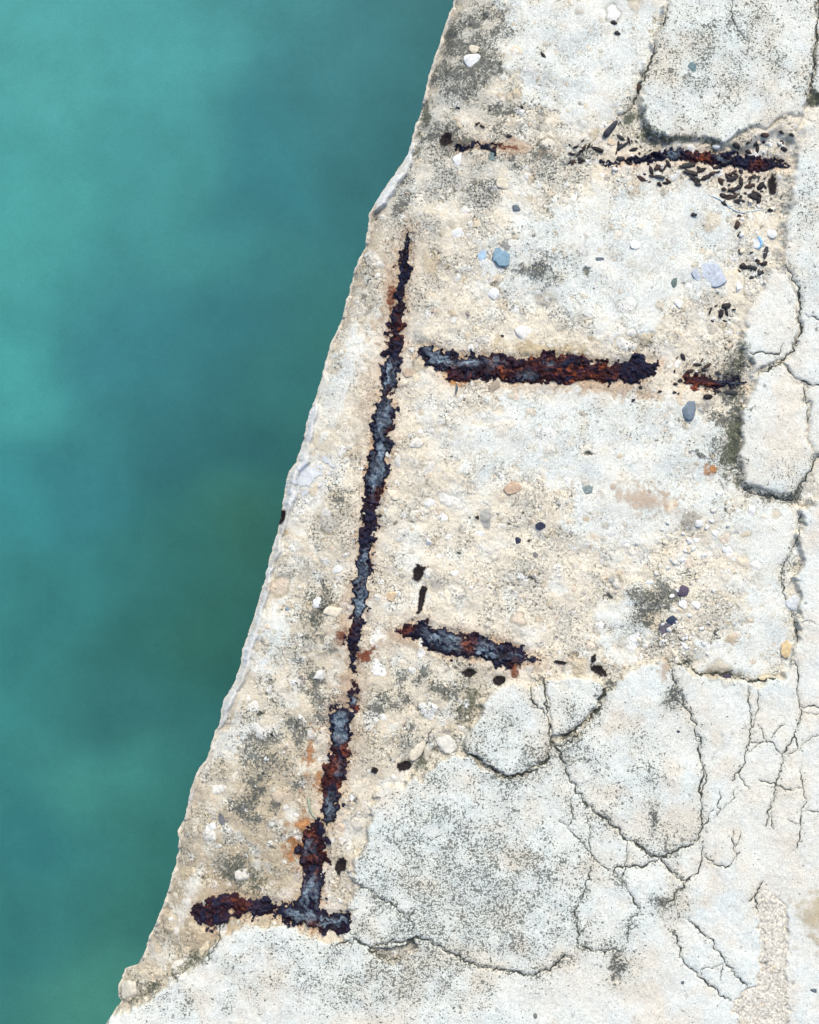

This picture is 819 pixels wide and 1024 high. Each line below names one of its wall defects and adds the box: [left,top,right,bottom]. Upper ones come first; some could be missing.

crack [622,6,668,116]
crack [807,0,819,101]
corrosion [599,147,790,173]
corrosion [680,372,747,391]
crack [751,268,819,423]
corrosion [190,231,667,936]
spalling [397,760,412,771]
crack [337,457,819,976]
spalling [590,664,608,677]
spalling [290,920,343,943]
crack [672,921,748,999]
spalling [731,891,791,1024]